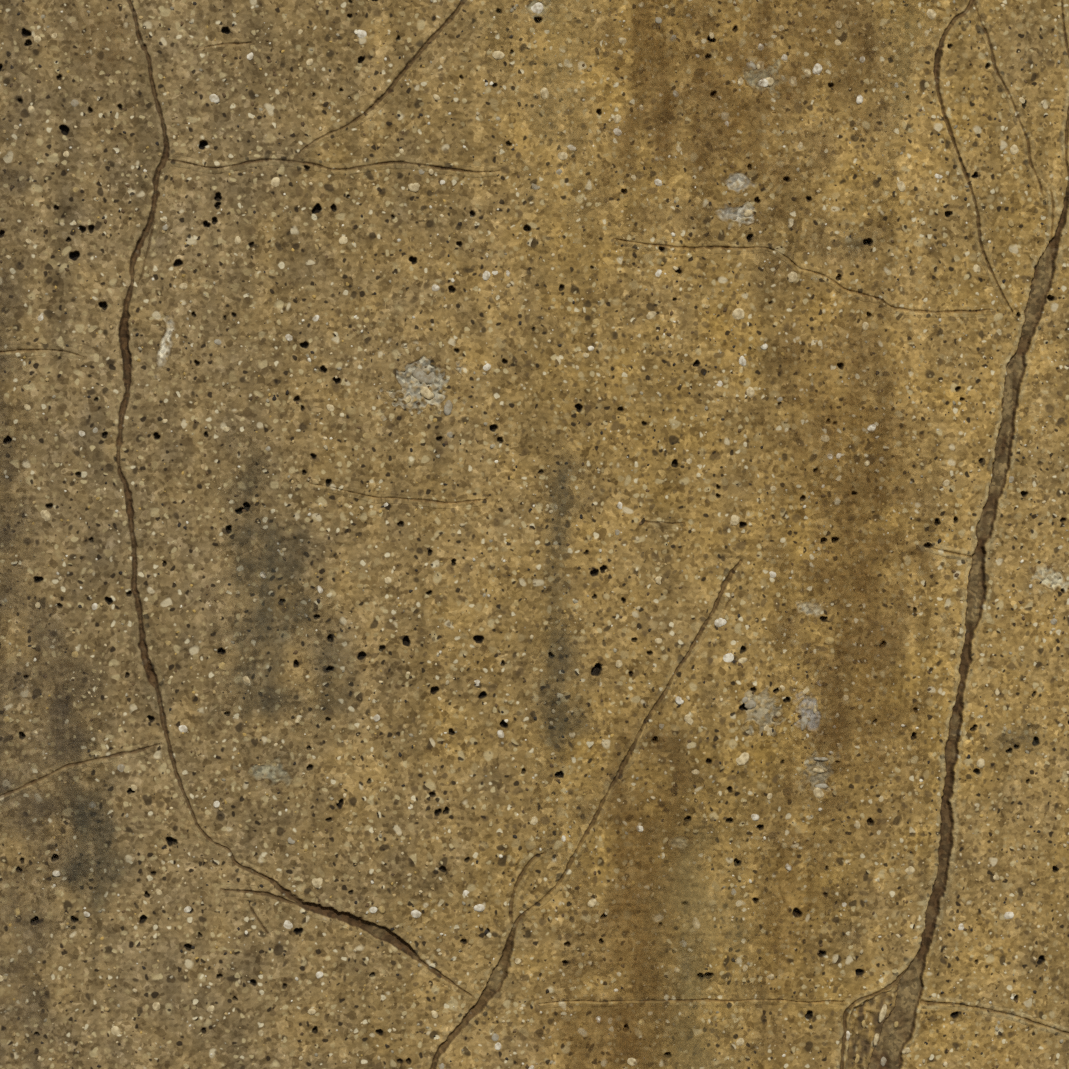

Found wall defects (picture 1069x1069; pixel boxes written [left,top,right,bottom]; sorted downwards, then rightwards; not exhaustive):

crack [0,0,744,1069]
crack [537,0,1069,1069]